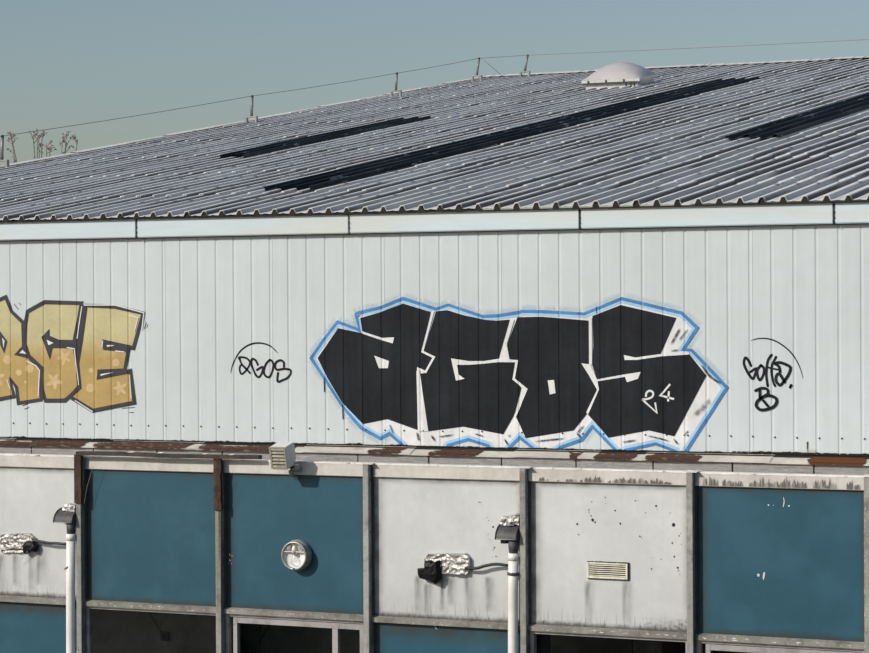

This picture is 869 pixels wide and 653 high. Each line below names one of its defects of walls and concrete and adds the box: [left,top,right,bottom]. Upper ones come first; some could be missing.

rust [0,436,276,452]
rust [294,442,869,466]
damp [539,476,671,484]
damp [705,478,831,489]